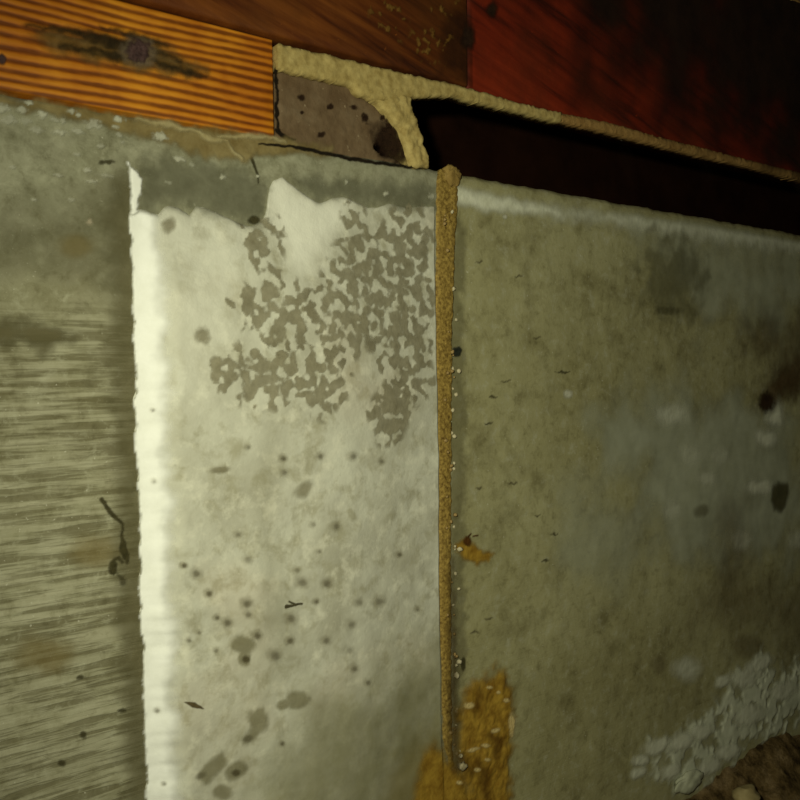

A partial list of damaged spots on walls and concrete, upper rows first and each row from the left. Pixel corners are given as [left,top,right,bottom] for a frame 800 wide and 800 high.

crack [250,67,425,178]
peeling [210,201,436,446]
crack [100,498,129,575]
corrosion [456,533,492,565]
leakage [233,637,253,664]
leakage [278,693,307,708]
leakage [244,709,266,741]
corrosion [415,672,515,800]
efflorescence [632,652,800,794]
leakage [200,755,246,782]
leakage [215,786,229,798]